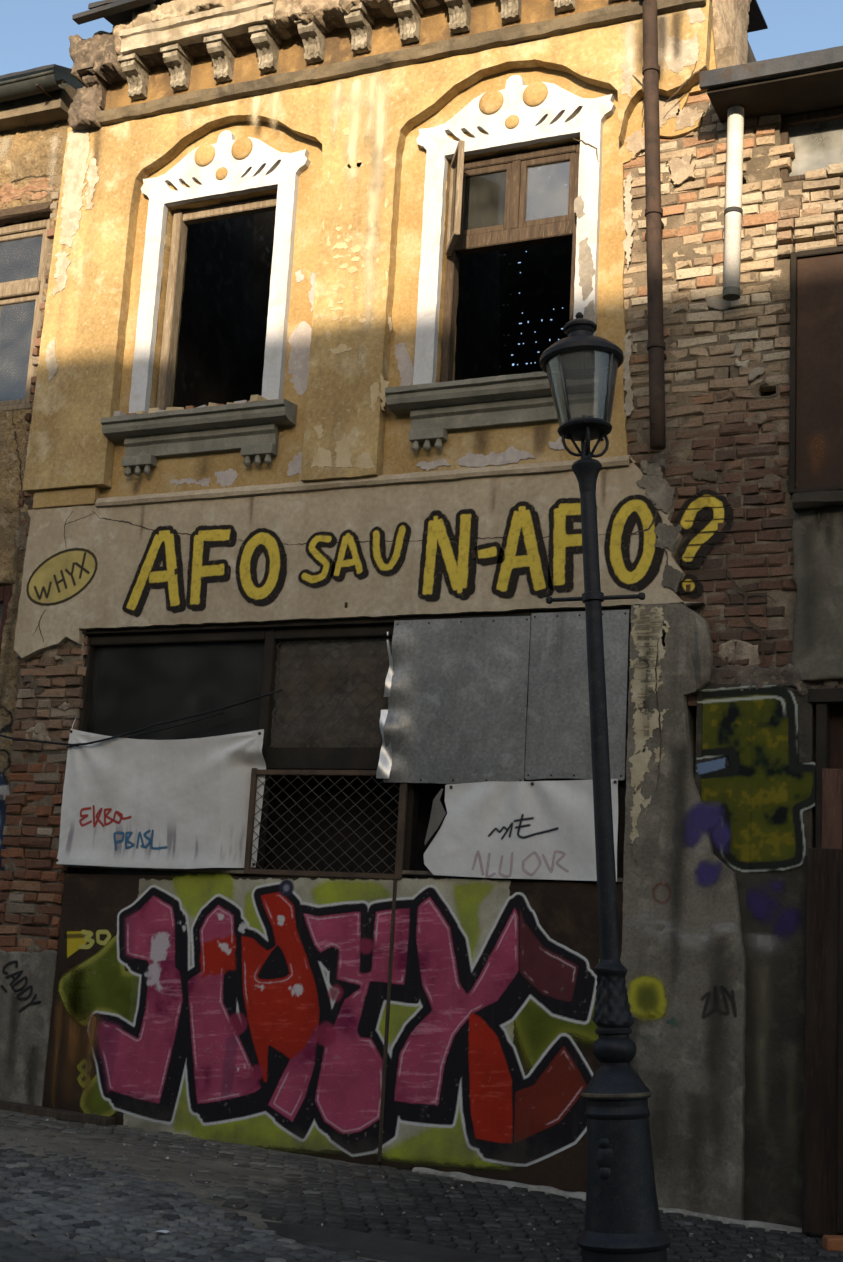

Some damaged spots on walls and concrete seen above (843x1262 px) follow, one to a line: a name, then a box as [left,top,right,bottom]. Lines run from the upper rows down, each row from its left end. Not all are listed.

spalling [149,0,225,23]
spalling [659,95,705,131]
peeling [344,160,365,170]
peeling [574,195,585,219]
peeling [288,221,388,395]
spalling [0,129,99,550]
peeling [370,314,414,412]
peeling [287,424,375,476]
spalling [415,446,535,471]
crack [64,511,191,544]
spalling [709,639,838,696]
peeling [629,605,670,861]